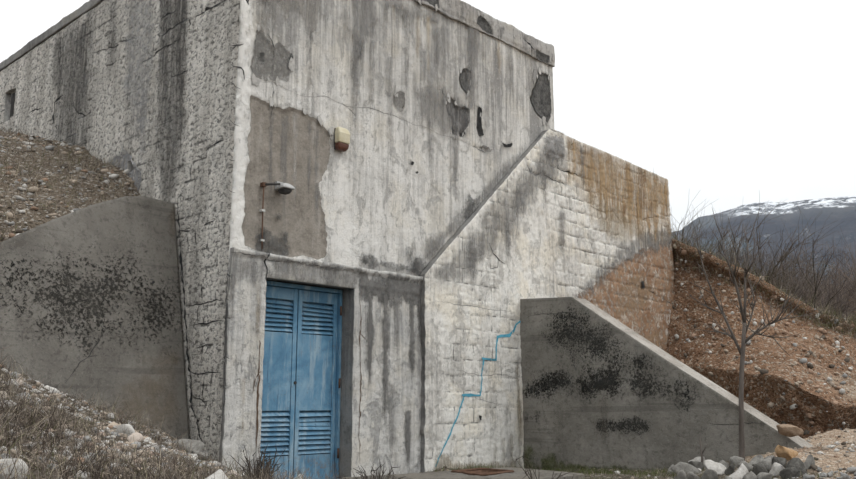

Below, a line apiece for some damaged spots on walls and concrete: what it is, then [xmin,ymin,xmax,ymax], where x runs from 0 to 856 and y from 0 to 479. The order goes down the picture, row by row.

peeling [242,25,334,259]
water stain [345,0,446,98]
spalling [394,86,405,112]
water stain [417,25,479,186]
spalling [442,67,512,152]
spalling [477,12,493,35]
spalling [531,50,552,126]
water stain [0,252,183,357]
crack [177,203,354,448]
water stain [256,135,565,444]
water stain [517,229,697,438]